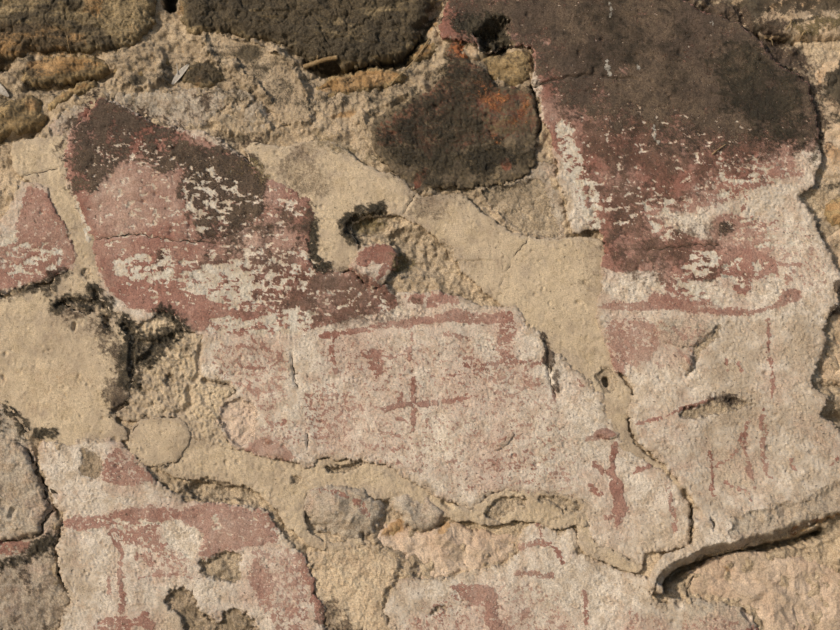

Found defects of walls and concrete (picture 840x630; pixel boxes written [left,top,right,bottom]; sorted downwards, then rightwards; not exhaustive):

damp [437,0,839,160]
damp [374,55,535,190]
peeling [555,120,603,231]
crack [99,222,255,244]
spalling [347,211,456,282]
spalling [594,366,618,393]
spalling [219,397,258,446]
crack [2,453,69,593]
spalling [186,479,252,501]
spalling [327,459,363,473]
spalling [486,496,527,519]
spalling [185,545,242,583]